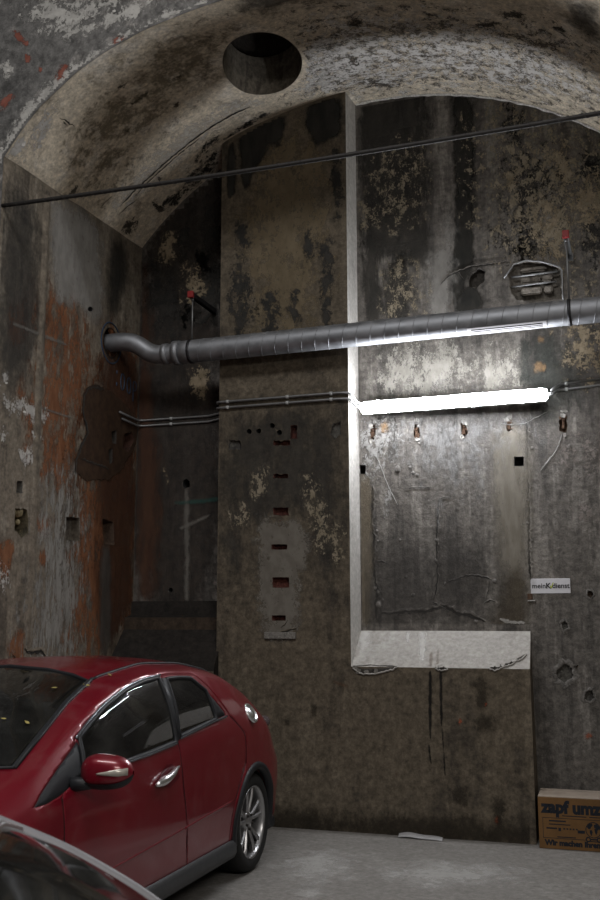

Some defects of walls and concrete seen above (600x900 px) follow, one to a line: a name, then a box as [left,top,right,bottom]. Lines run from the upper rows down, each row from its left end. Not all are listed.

peeling [0,0,208,164]
crack [101,107,250,215]
water stain [109,97,285,212]
water stain [305,98,345,222]
water stain [357,96,483,321]
peeling [278,0,600,302]
water stain [256,289,302,332]
peeling [376,254,432,318]
peeling [0,371,50,467]
rust [18,280,138,656]
crack [370,485,496,622]
spalling [352,664,397,675]